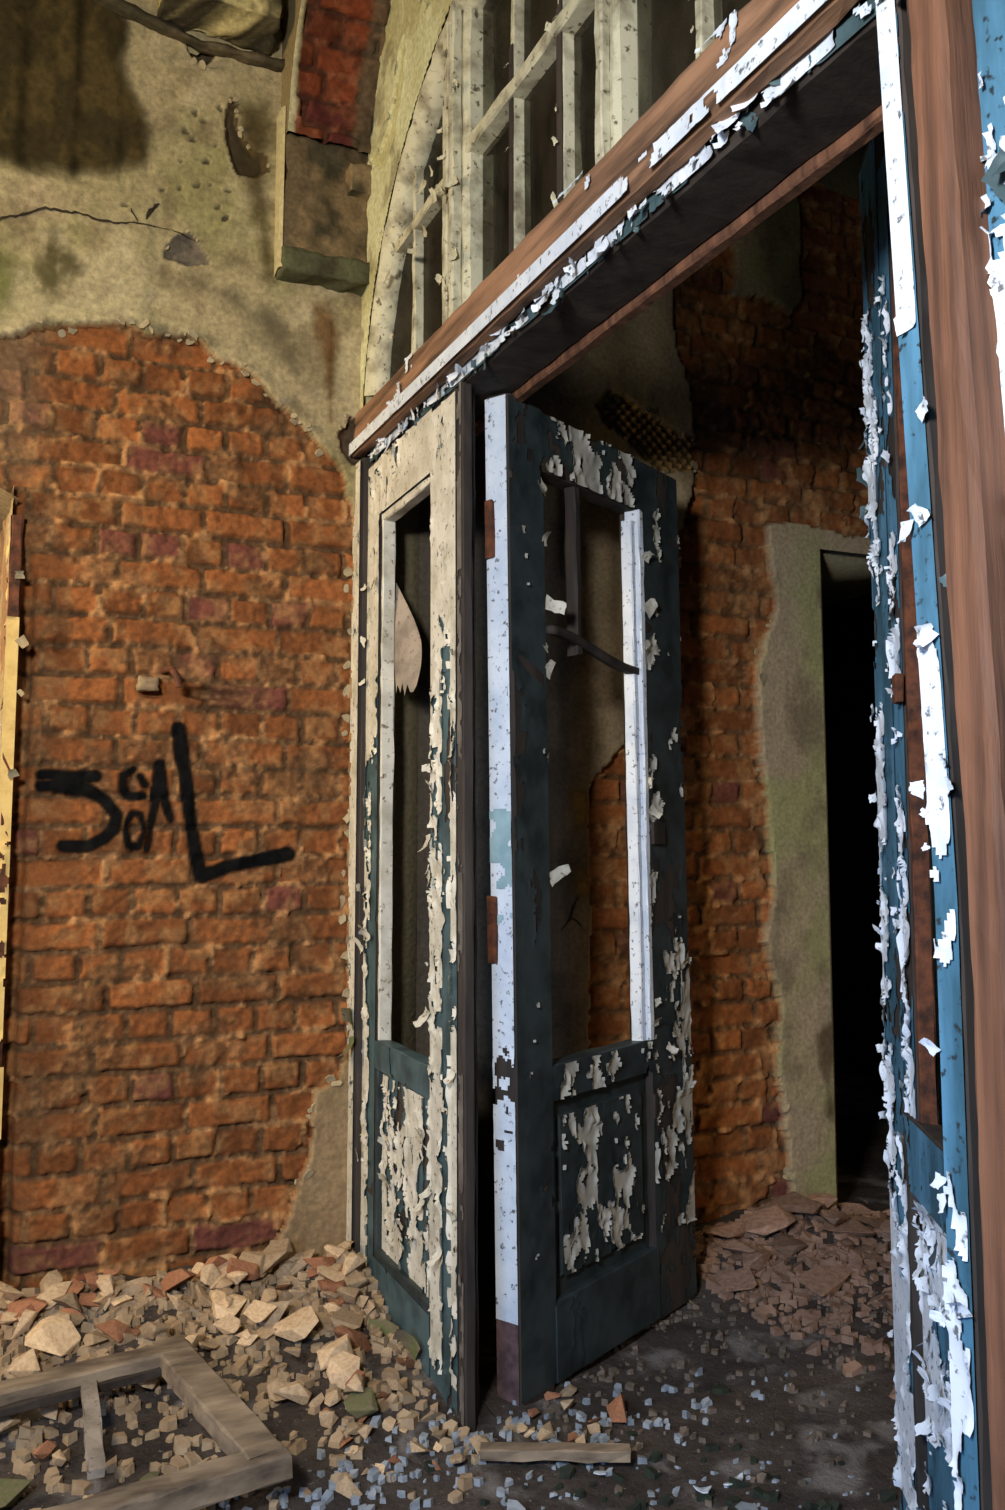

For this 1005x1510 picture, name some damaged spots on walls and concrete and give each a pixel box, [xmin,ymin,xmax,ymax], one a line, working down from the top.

crack [0,203,196,241]
spalling [0,0,840,1426]
spalling [538,0,974,1510]
peeling [980,123,1005,427]